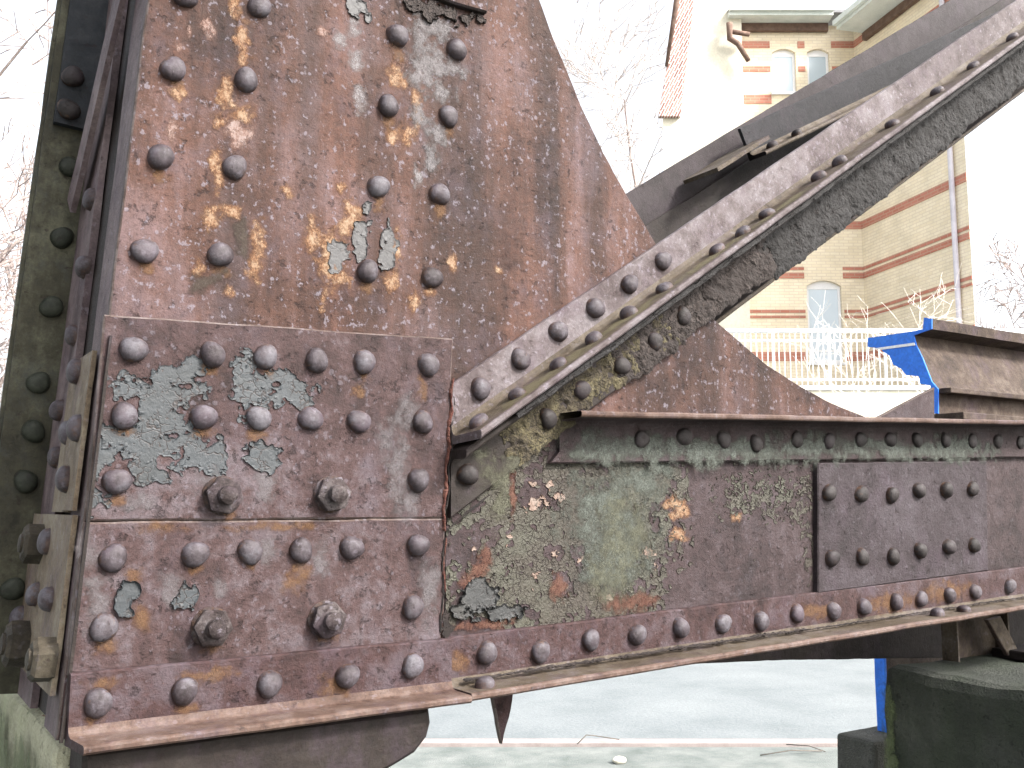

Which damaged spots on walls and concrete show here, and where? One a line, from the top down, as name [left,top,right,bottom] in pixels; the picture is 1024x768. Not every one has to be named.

corrosion [229,0,252,66]
peeling [346,0,372,24]
peeling [402,0,487,28]
corrosion [213,76,256,128]
corrosion [202,149,242,231]
corrosion [245,220,267,284]
corrosion [304,182,382,312]
peeling [327,201,400,274]
corrosion [383,271,400,292]
peeling [228,347,322,424]
peeling [91,354,284,518]
peeling [445,426,998,631]